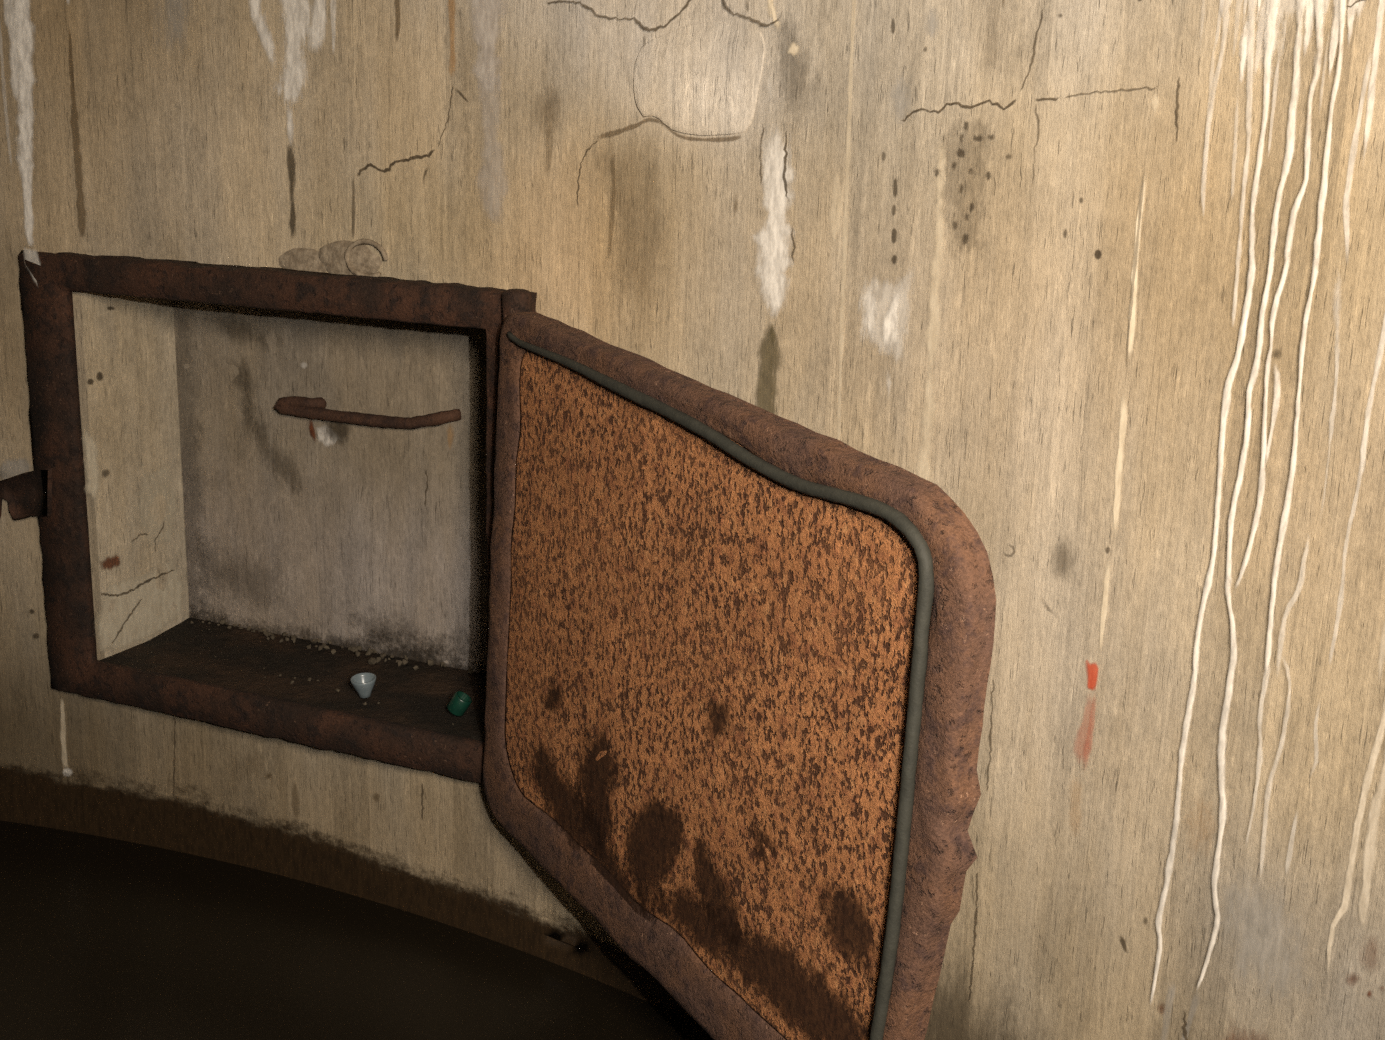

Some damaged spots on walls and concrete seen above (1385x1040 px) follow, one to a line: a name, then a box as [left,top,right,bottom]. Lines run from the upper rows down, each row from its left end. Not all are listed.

damp [4,0,39,282]
damp [250,0,335,233]
crack [358,88,467,175]
crack [577,142,596,203]
crack [548,0,779,31]
damp [754,132,794,413]
crack [903,13,1180,140]
damp [1344,0,1385,249]
damp [1361,318,1385,466]
corrosion [103,556,120,569]
damp [0,702,699,1025]
damp [1327,710,1385,967]